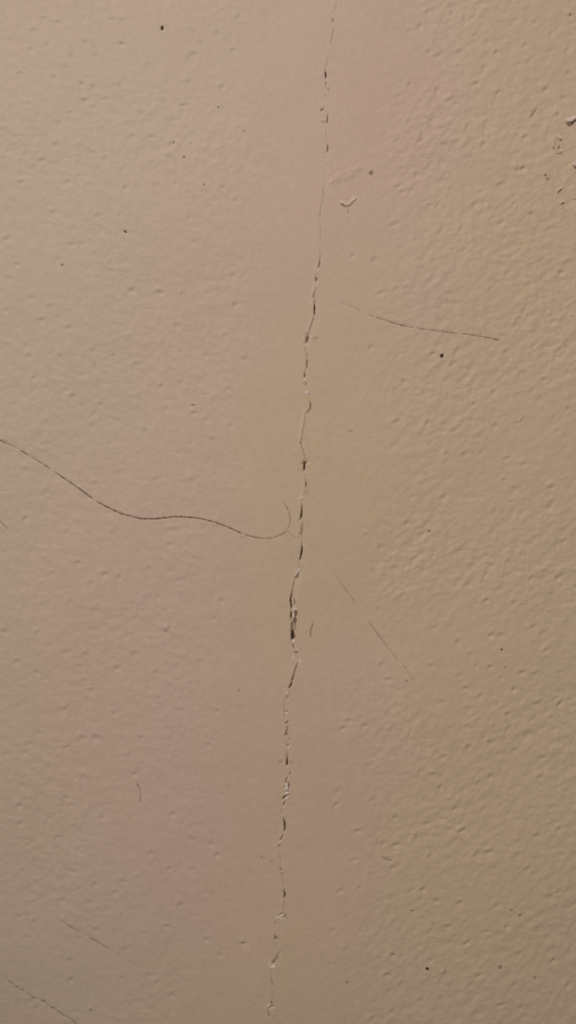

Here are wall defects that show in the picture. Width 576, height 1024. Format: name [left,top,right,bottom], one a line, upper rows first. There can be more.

crack [0,0,344,1024]
crack [341,302,499,341]